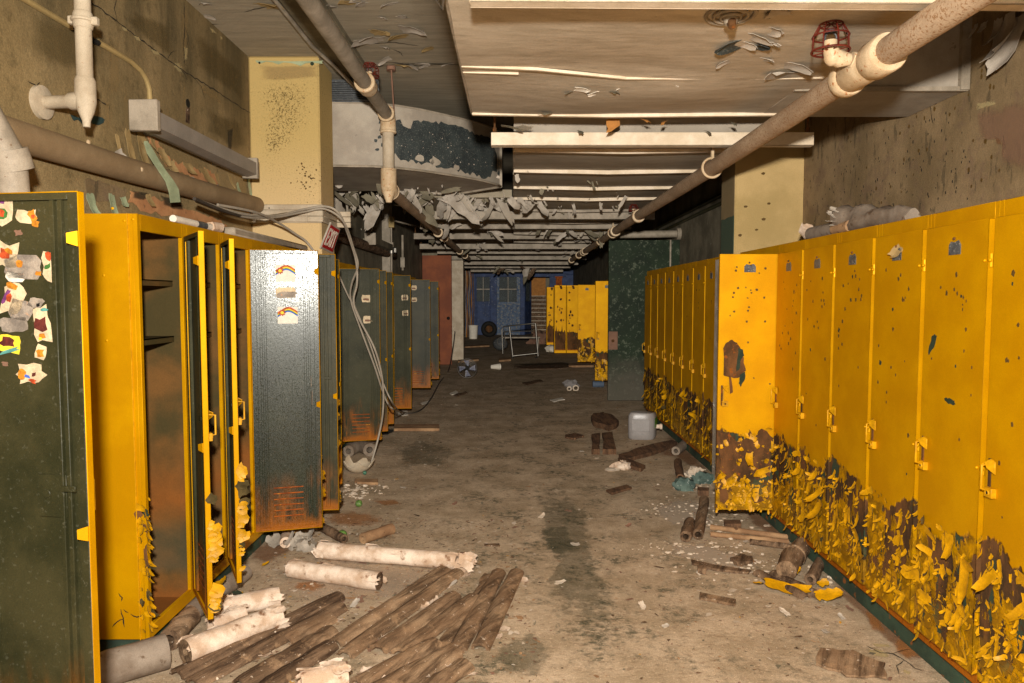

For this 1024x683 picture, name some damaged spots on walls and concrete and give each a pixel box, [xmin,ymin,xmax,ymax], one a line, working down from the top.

peeling [351,2,458,71]
peeling [714,10,813,80]
peeling [967,11,1024,89]
peeling [86,128,252,227]
peeling [374,120,520,183]
peeling [333,180,627,284]